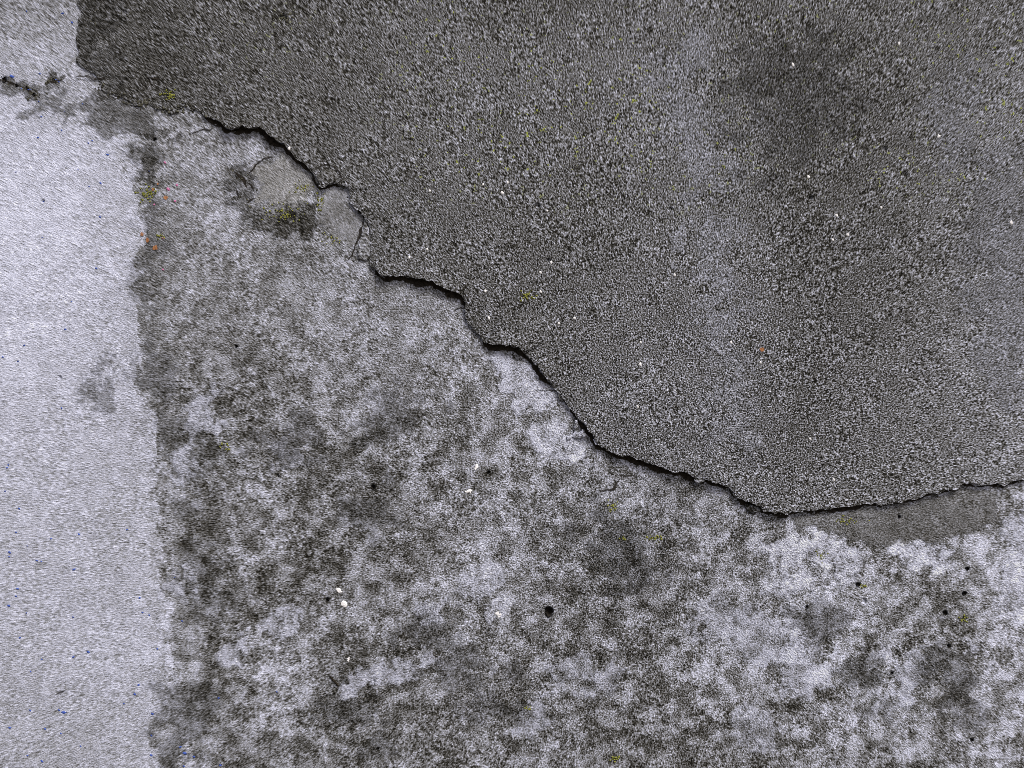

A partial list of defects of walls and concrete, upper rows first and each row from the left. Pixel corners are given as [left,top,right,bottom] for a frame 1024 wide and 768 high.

crack [189,118,343,203]
mould [225,161,330,242]
crack [345,210,364,261]
crack [375,270,465,311]
peeling [76,0,1024,515]
leakage [639,24,776,461]
leakage [913,54,1024,413]
leakage [170,382,227,484]
leakage [489,351,587,463]
crack [483,341,1024,519]
leakage [685,488,1024,701]
leakage [308,652,440,768]